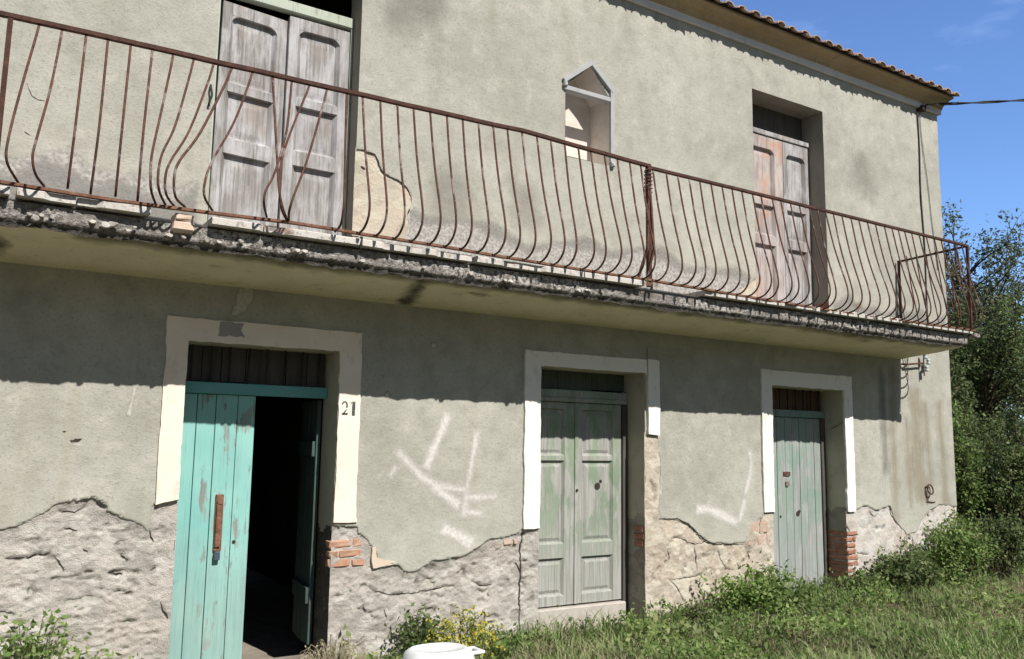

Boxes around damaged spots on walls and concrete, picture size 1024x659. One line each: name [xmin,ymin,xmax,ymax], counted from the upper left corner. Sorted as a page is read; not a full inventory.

spalling [0,148,969,347]
spalling [0,498,178,659]
spalling [325,524,539,659]
spalling [634,432,775,623]
spalling [827,505,957,589]